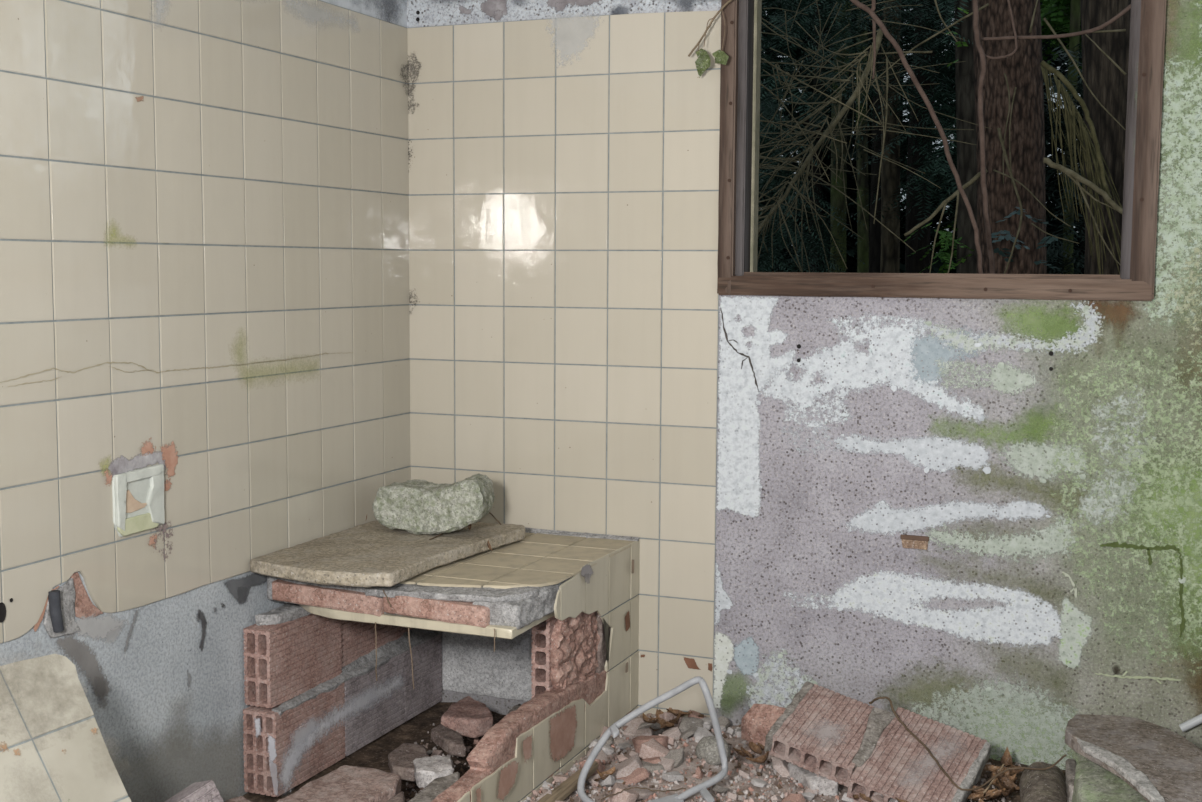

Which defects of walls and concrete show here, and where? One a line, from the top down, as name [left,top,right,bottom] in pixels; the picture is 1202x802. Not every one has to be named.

spalling [459,0,508,21]
spalling [546,0,602,12]
damp [400,54,420,114]
crack [0,352,350,387]
crack [721,310,759,391]
peeling [716,23,1202,675]
spalling [105,438,178,491]
spalling [34,572,103,632]
crack [1100,542,1186,637]
damp [56,613,125,700]